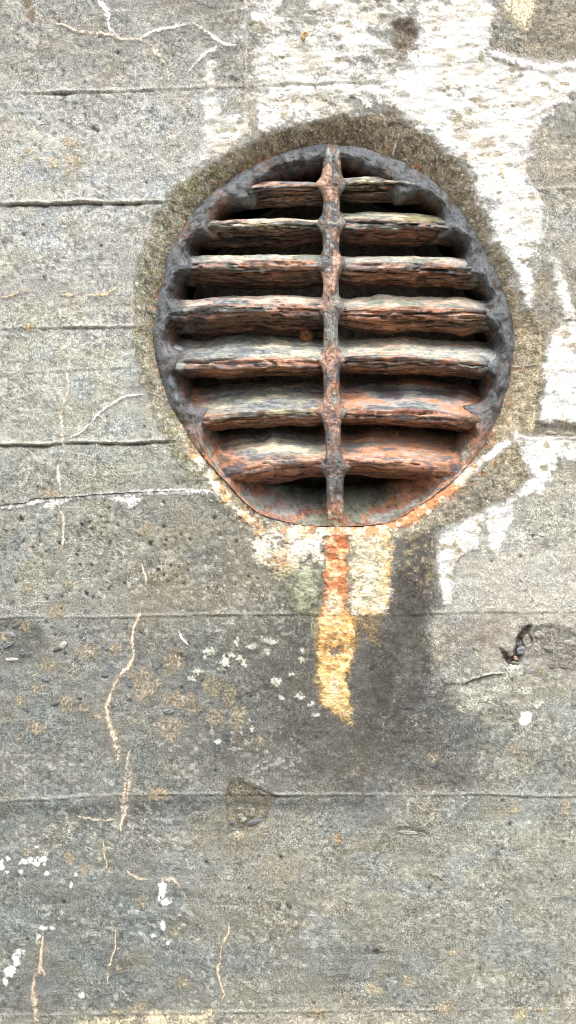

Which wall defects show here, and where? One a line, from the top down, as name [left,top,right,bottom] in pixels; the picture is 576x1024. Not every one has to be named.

crack [53,0,255,134]
crack [79,610,189,902]
damp [180,433,272,536]
rust [249,462,478,724]
damp [197,0,576,763]
spalling [458,625,576,713]